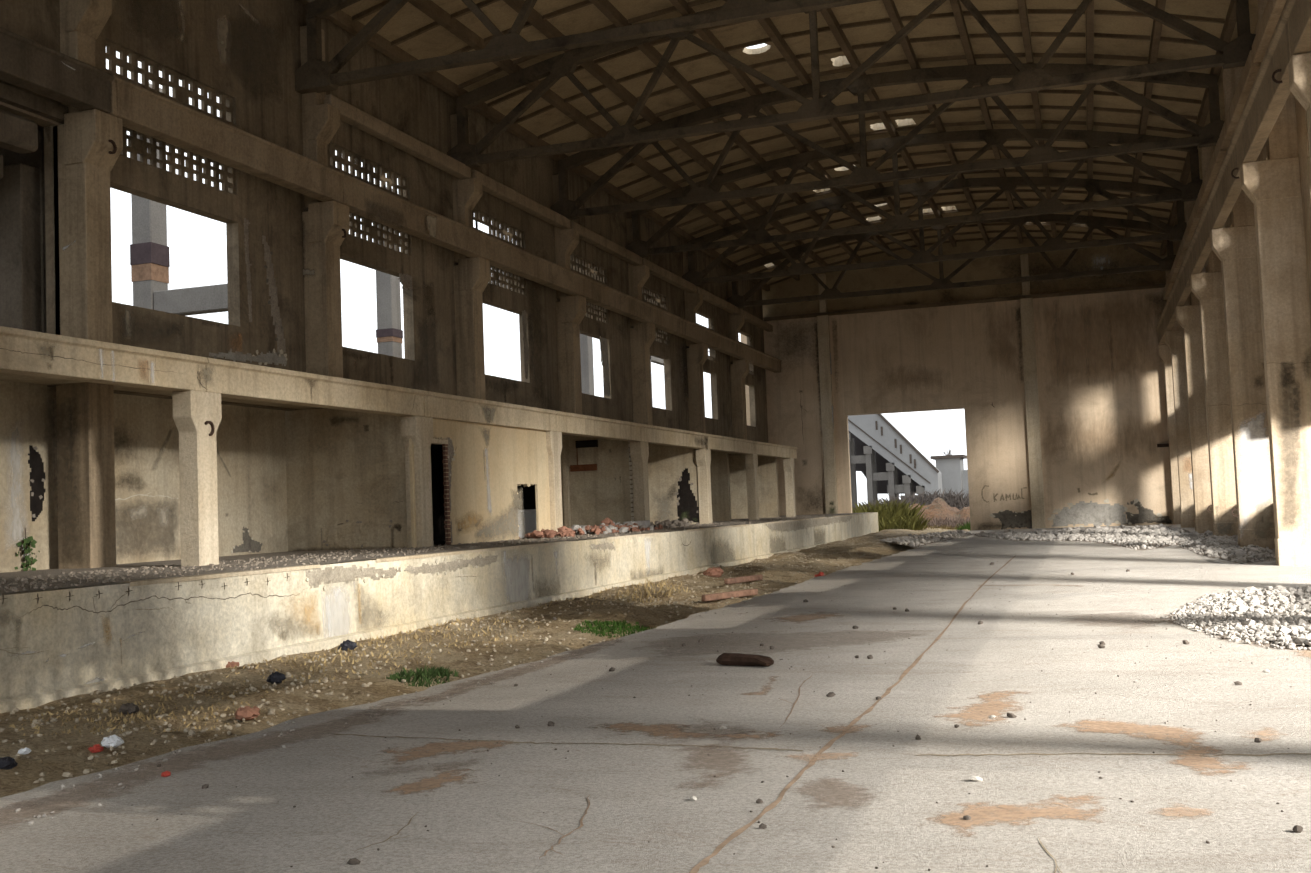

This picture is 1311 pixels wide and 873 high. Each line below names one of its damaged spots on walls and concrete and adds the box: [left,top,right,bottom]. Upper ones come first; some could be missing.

hole [28,445,46,521]
water stain [116,504,175,553]
crack [0,592,297,655]
crack [779,674,813,728]